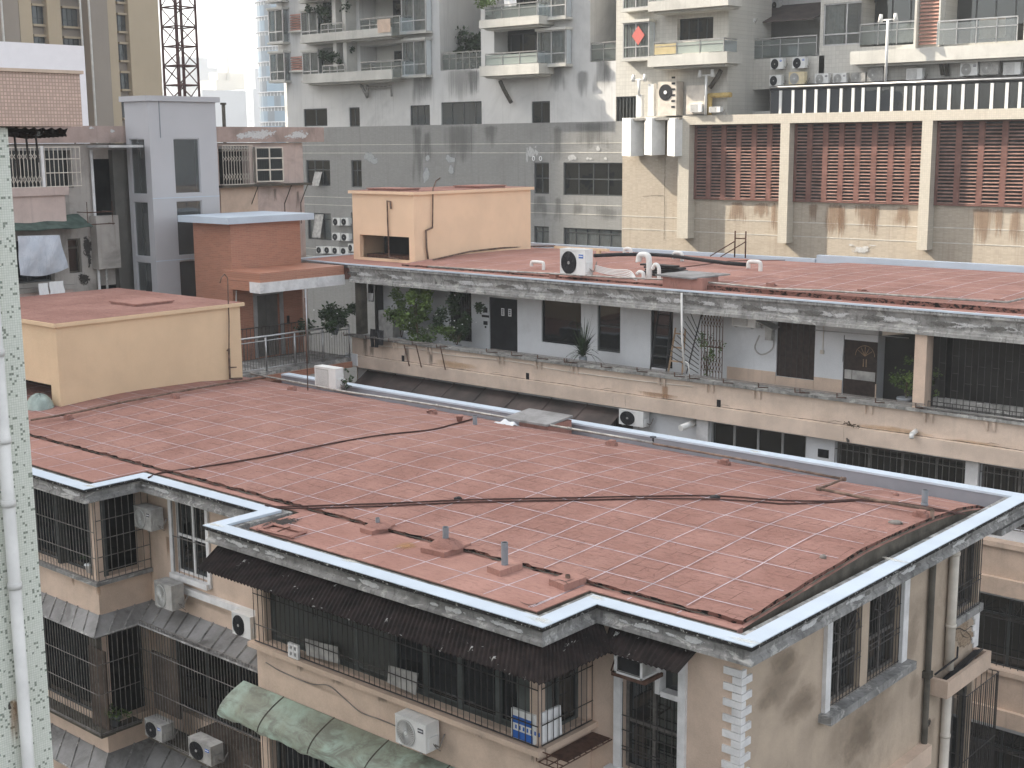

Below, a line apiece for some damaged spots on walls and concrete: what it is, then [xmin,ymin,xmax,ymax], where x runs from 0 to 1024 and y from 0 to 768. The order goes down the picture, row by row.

peeling [236,129,308,140]
spalling [348,264,1024,333]
spalling [30,434,368,525]
crack [30,435,432,542]
spalling [388,529,434,541]
peeling [347,577,379,590]
spalling [463,548,501,560]
spalling [522,563,563,575]
crack [463,550,716,617]
spalling [586,505,985,625]
peeling [430,602,523,633]
peeling [619,618,705,644]